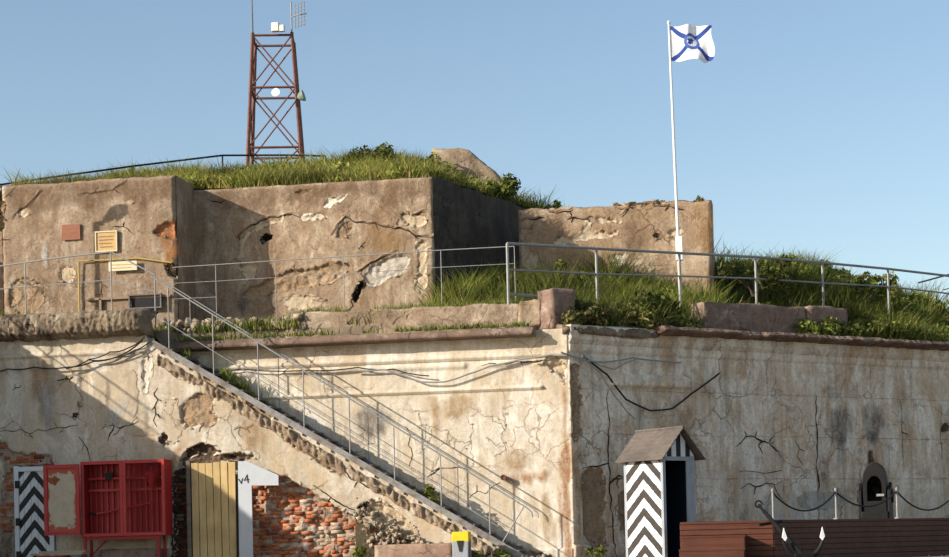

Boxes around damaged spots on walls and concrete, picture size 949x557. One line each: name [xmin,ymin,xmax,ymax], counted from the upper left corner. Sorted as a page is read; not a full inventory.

crack [234,211,333,298]
spalling [238,216,349,310]
crack [330,209,434,277]
spalling [351,239,431,303]
spalling [554,200,669,246]
flaking render [0,440,56,537]
crack [0,370,162,461]
flaking render [158,433,255,557]
crack [175,395,269,471]
spalling [172,373,347,476]
flaking render [252,474,420,557]
crack [737,395,820,515]